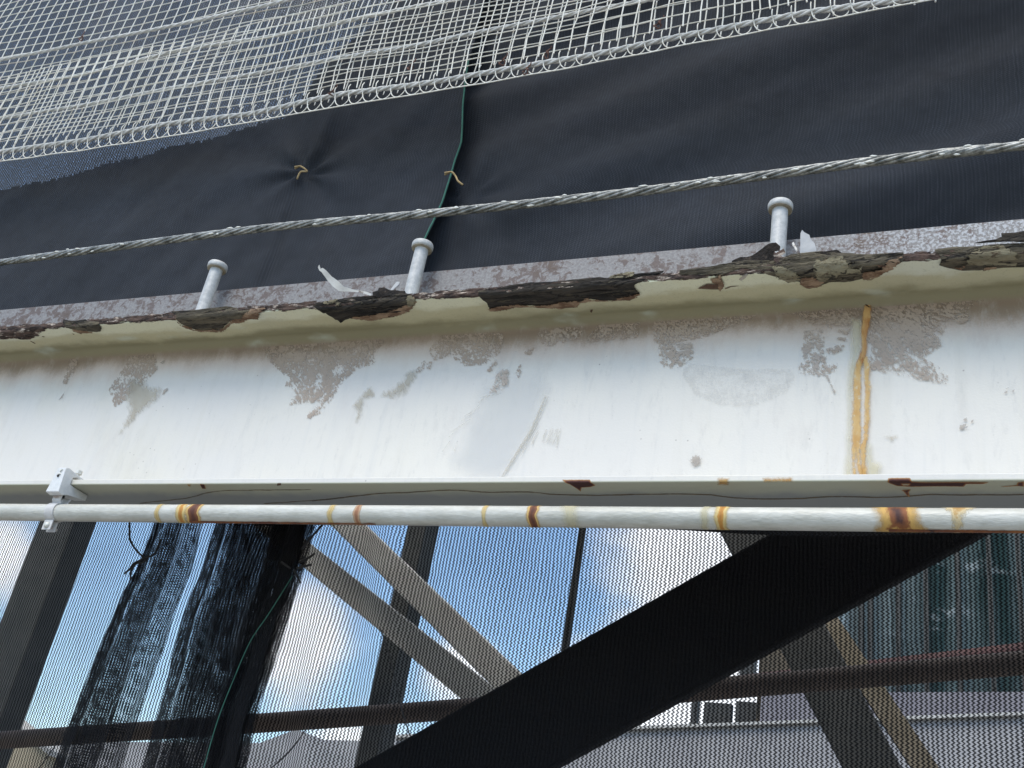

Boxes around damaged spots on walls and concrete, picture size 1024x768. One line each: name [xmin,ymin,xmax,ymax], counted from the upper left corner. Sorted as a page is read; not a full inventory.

spalling [679,230,904,289]
spalling [934,243,1024,271]
spalling [314,265,417,323]
spalling [478,270,664,313]
spalling [0,326,46,344]
spalling [63,319,102,335]
spalling [171,306,265,333]
peeling [867,301,978,384]
peeling [263,339,384,419]
corrosion [529,304,1024,533]
corrosion [140,484,504,525]
corrosion [526,506,542,528]